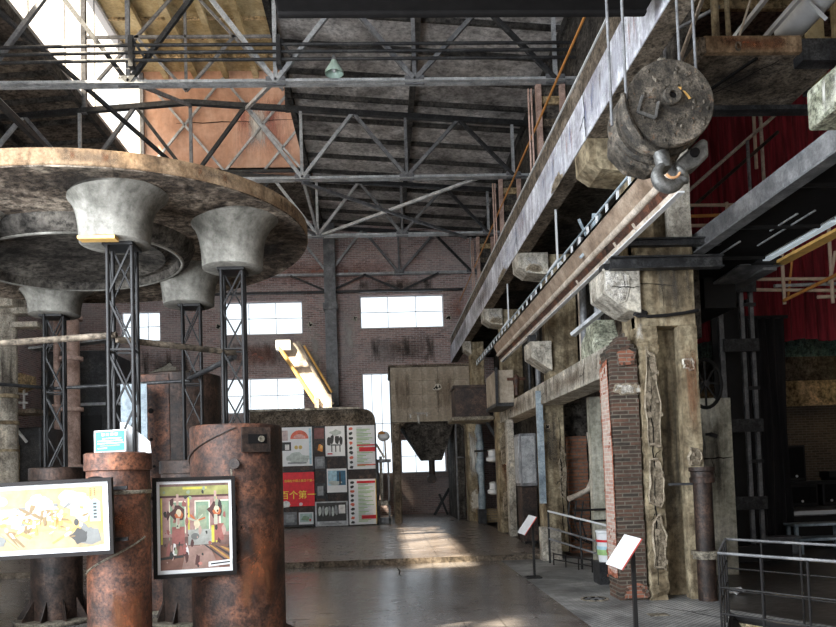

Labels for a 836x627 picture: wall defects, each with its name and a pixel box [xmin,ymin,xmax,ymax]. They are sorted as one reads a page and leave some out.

peeling [599,344,663,578]
spalling [624,582,650,599]
crack [648,358,661,585]
spalling [648,458,668,571]